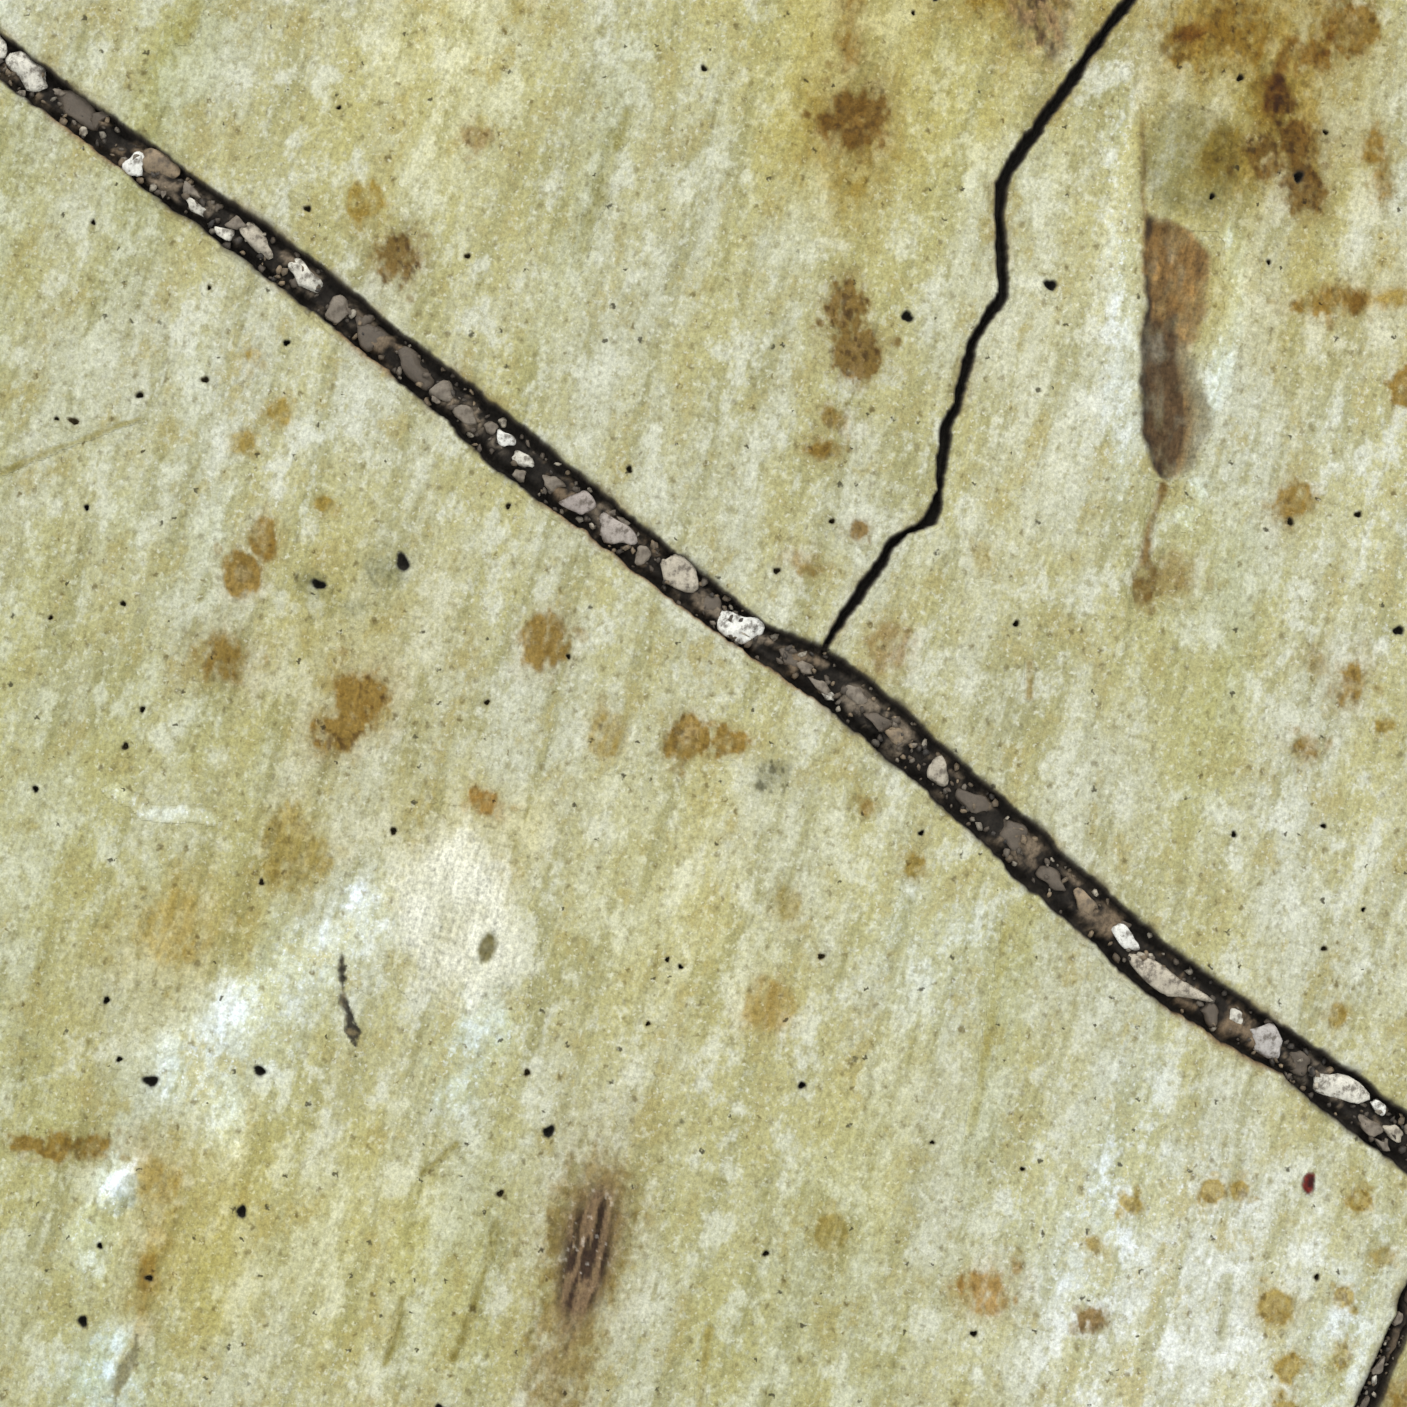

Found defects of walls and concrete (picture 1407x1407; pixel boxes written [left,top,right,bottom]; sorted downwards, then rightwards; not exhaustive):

rust [909,0,1060,124]
rust [1057,0,1407,334]
rust [733,0,967,471]
crack [268,265,288,282]
crack [391,366,402,380]
rust [1377,347,1407,427]
crack [611,544,636,554]
crack [871,734,883,748]
crack [908,739,930,756]
crack [1002,848,1017,866]
crack [1308,1066,1320,1077]
crack [1347,1263,1407,1407]